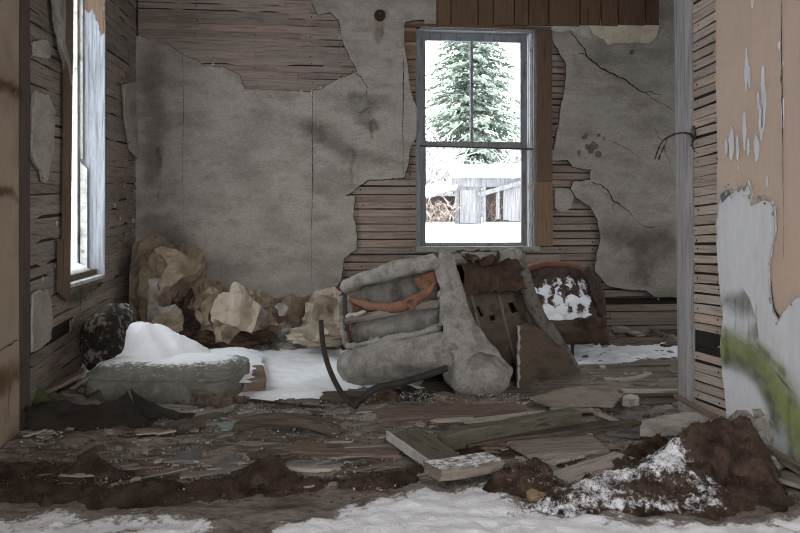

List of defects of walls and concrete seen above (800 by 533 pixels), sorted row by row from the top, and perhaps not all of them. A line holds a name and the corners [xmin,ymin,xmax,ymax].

crack [570,31,675,112]
flaking render [30,0,358,406]
flaking render [336,139,533,292]
flaking render [524,42,677,332]
crack [592,182,660,234]
peeling [692,0,800,406]
peeling [693,346,800,463]